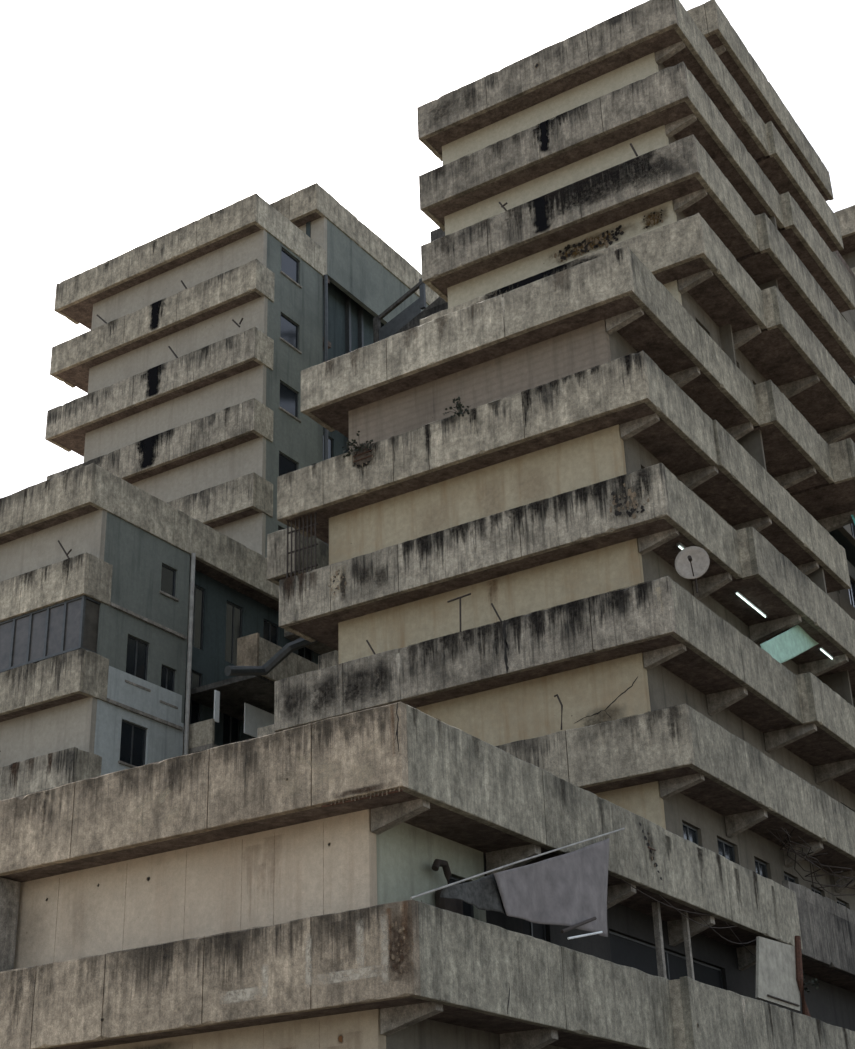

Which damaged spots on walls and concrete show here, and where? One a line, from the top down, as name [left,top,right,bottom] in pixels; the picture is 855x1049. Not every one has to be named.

water stain [533,105,584,151]
water stain [507,151,665,233]
water stain [137,428,173,468]
water stain [403,469,650,569]
water stain [284,582,660,741]
crack [575,677,638,723]
water stain [330,906,388,983]
water stain [226,966,268,1002]